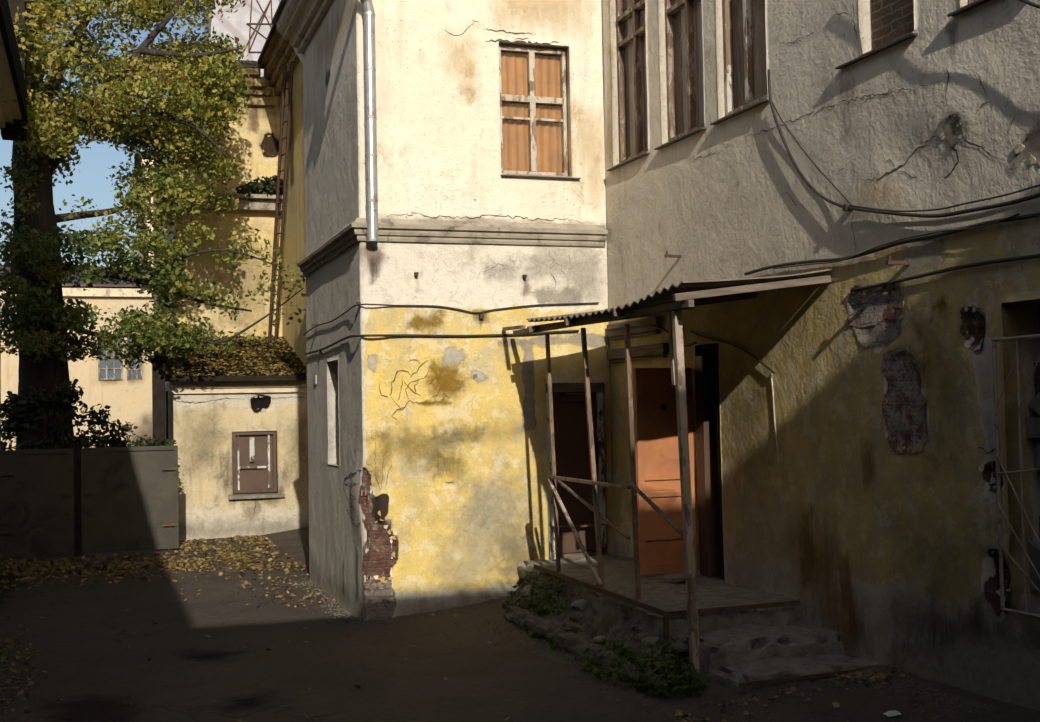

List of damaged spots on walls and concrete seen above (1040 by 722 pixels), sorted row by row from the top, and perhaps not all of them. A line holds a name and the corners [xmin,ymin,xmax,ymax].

crack [442,20,562,45]
crack [689,69,990,160]
crack [838,136,1005,182]
peeling [1011,119,1040,170]
crack [387,212,592,224]
flaking render [960,306,985,354]
crack [379,359,448,422]
damp [421,362,463,405]
flaking render [847,283,927,454]
flaking render [978,447,1003,493]
flaking render [359,460,399,621]
flaking render [984,549,1011,618]